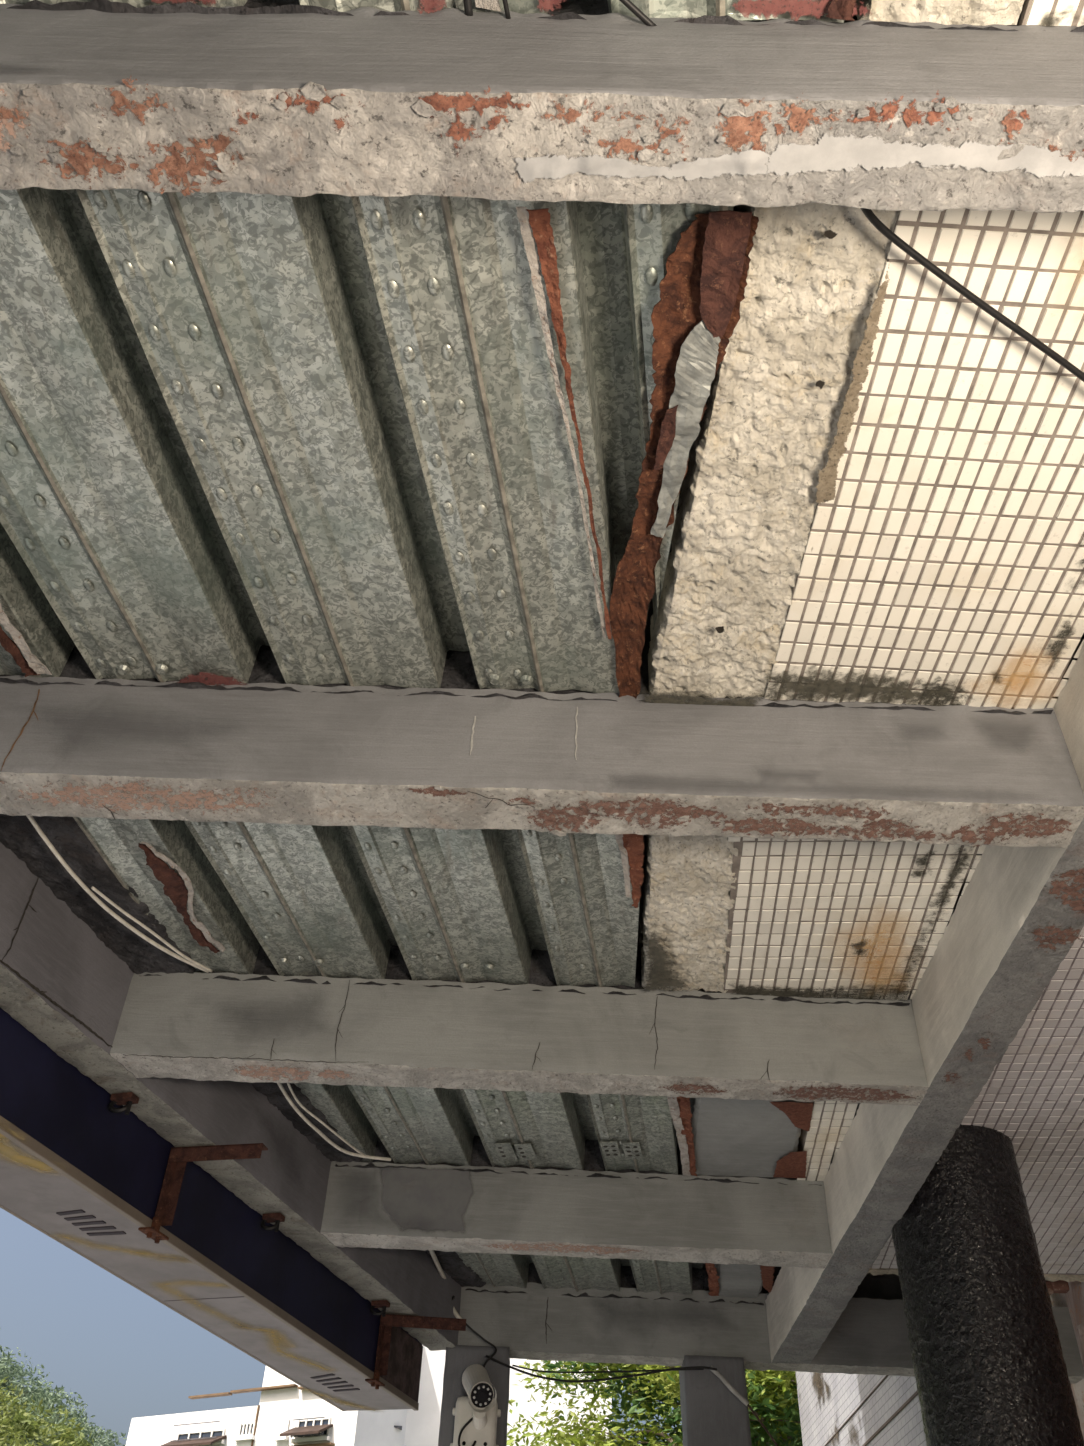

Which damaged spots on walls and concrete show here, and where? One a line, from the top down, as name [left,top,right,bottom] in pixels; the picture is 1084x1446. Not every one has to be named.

corrosion [475,0,501,11]
corrosion [733,0,871,21]
corrosion [36,75,259,197]
corrosion [270,81,364,131]
corrosion [412,86,695,162]
corrosion [715,91,972,152]
corrosion [516,206,759,700]
corrosion [0,602,52,677]
damp [1048,621,1075,669]
corrosion [507,795,1072,908]
corrosion [138,841,225,953]
damp [731,847,972,1001]